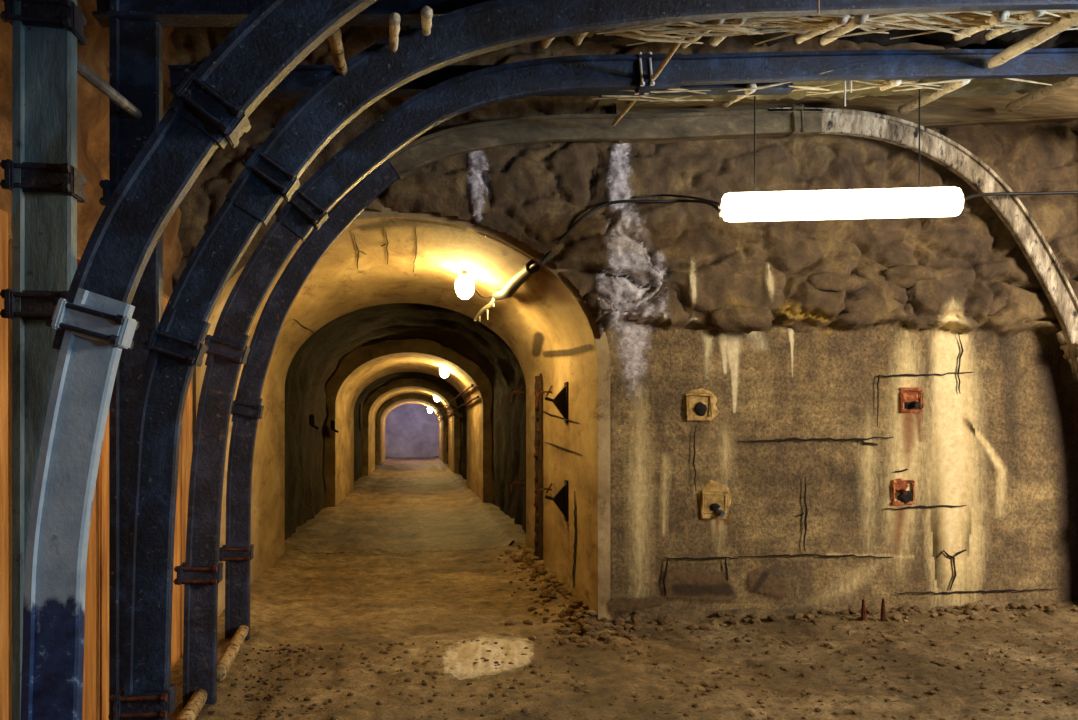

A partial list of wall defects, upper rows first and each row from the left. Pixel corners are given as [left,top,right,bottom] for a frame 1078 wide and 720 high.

damp [470,150,563,300]
damp [597,142,667,395]
corrosion [905,408,921,449]
crack [896,549,1049,594]